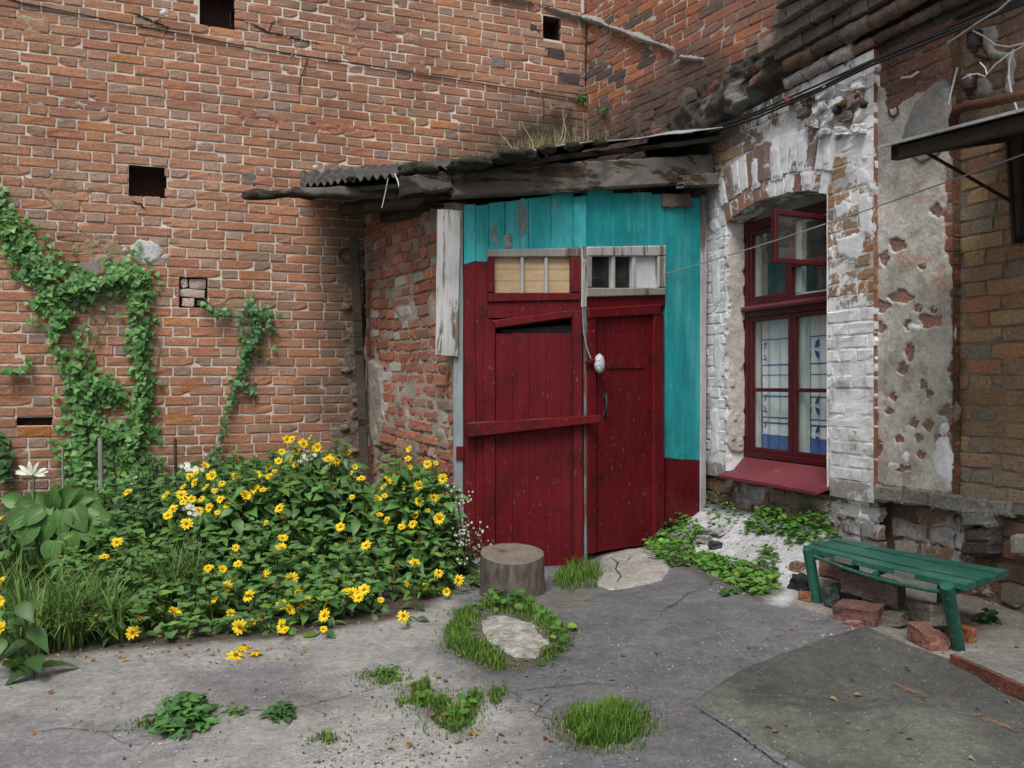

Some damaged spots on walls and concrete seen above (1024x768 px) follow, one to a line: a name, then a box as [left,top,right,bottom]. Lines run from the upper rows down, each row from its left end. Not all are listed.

peeling [751,144,783,191]
peeling [796,125,832,191]
peeling [832,147,876,264]
flaking render [930,203,949,218]
flaking render [879,238,907,266]
flaking render [879,289,942,375]
flaking render [920,379,934,399]
peeling [878,401,961,483]